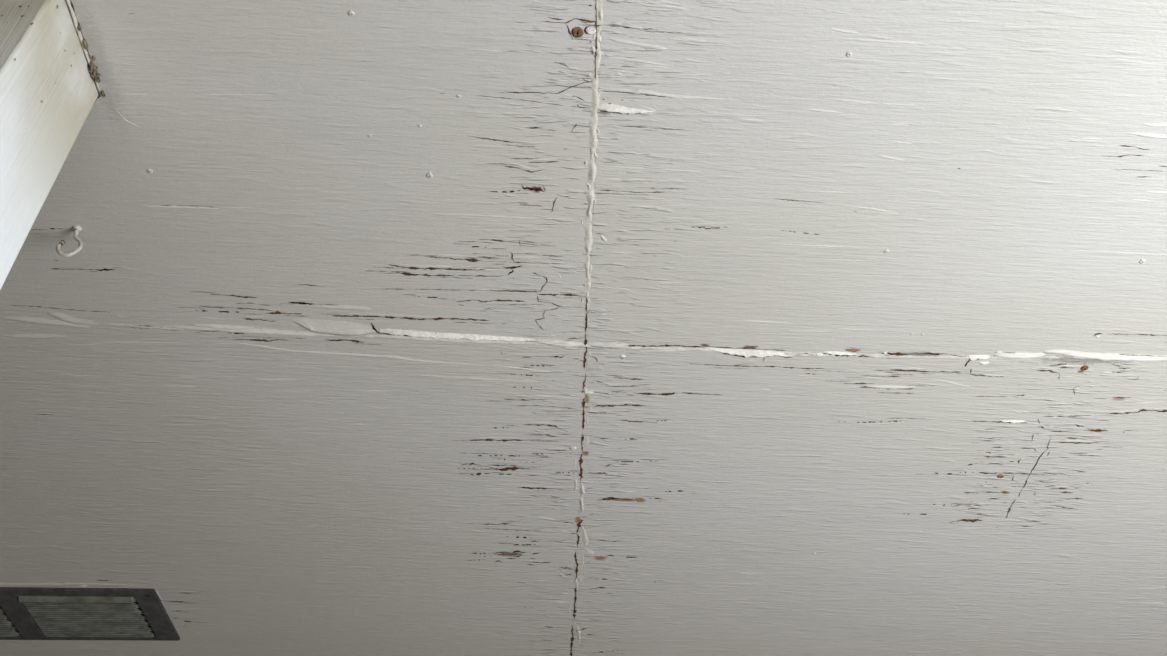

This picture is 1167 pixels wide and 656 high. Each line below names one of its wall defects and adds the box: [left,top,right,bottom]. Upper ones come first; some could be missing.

peeling [597,103,655,114]
crack [54,260,116,272]
peeling [171,324,343,337]
peeling [374,329,535,344]
peeling [705,348,990,367]
crack [133,239,1024,656]
crack [908,364,1167,528]
peeling [467,550,551,564]